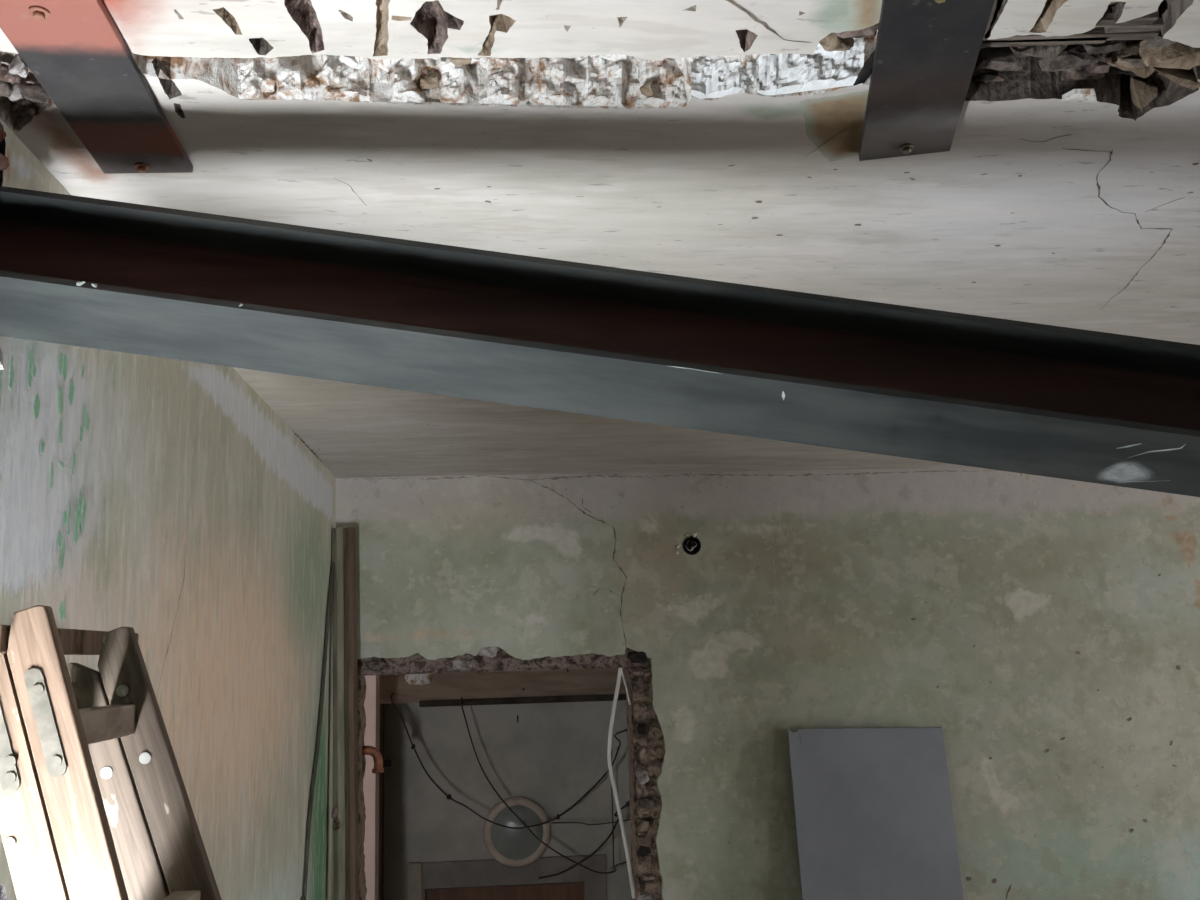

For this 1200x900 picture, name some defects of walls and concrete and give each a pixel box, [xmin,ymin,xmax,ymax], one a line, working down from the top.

spalling [0,51,63,187]
spalling [152,58,186,118]
spalling [212,7,273,55]
spalling [284,0,324,53]
spalling [735,29,758,52]
crack [726,0,812,43]
spalling [965,0,1200,121]
crack [1020,134,1184,310]
peeling [0,342,91,626]
crack [293,432,1035,649]
peeling [682,625,773,686]
spalling [357,646,665,900]